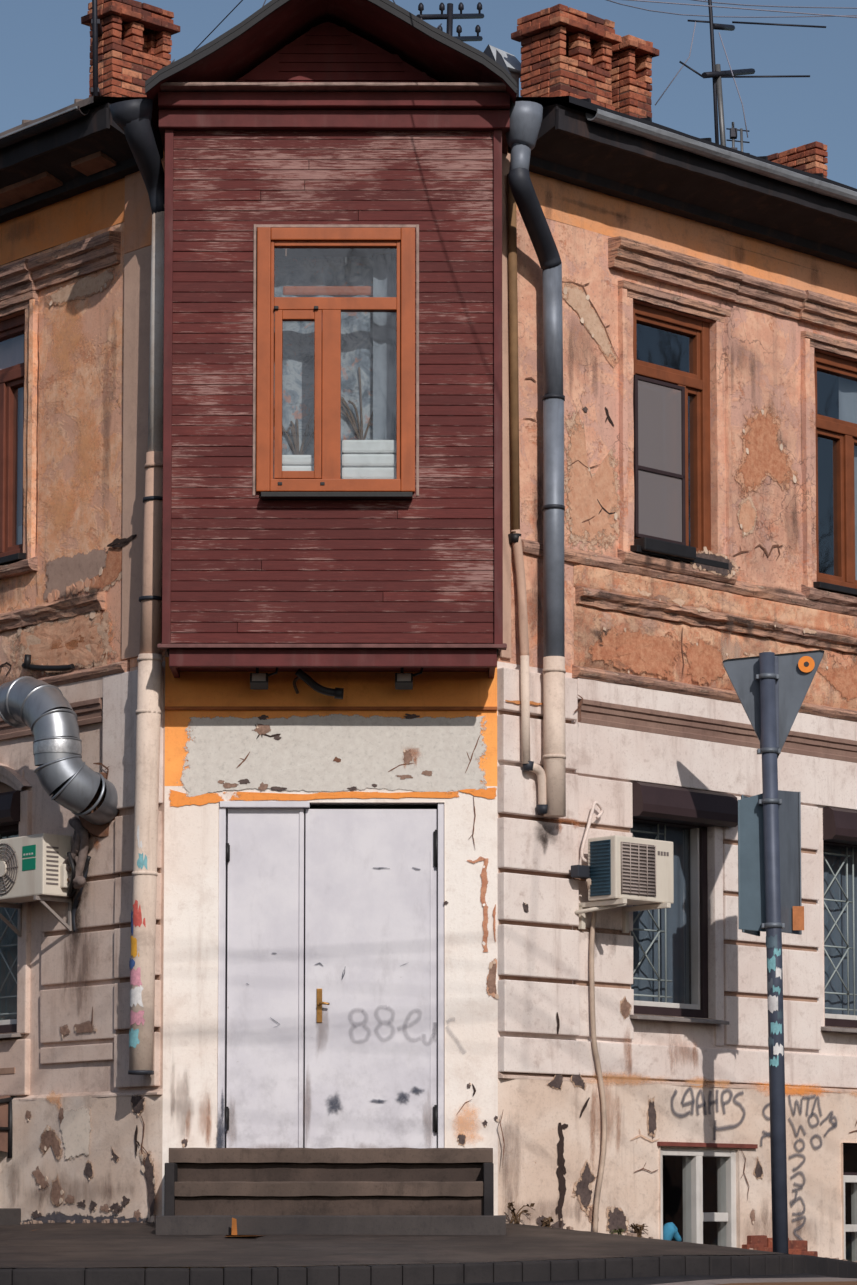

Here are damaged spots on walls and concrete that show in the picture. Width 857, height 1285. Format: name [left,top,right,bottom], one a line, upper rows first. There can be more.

crack [562,281,619,359]
spalling [732,401,799,537]
spalling [47,543,122,603]
spalling [8,610,118,678]
spalling [586,627,728,686]
peeling [467,856,499,999]
spalling [130,1094,145,1117]
spalling [547,1073,586,1090]
spalling [647,1097,657,1139]
spalling [31,1107,156,1222]
spalling [572,1160,629,1235]